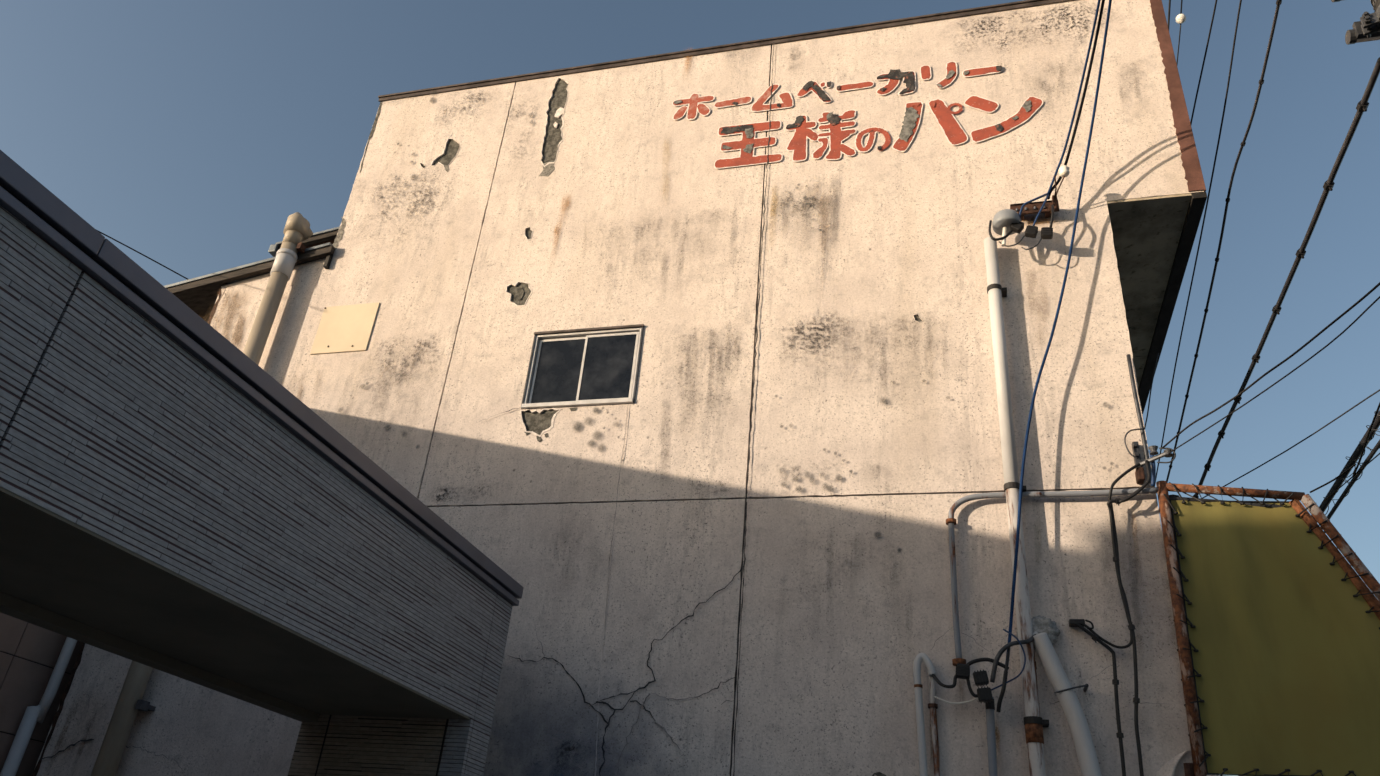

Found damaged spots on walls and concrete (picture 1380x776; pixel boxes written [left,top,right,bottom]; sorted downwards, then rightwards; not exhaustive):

spalling [539,77,568,177]
spalling [420,134,460,172]
spalling [505,281,532,306]
water stain [789,319,833,348]
spalling [520,407,577,442]
water stain [574,407,619,450]
crack [510,42,774,776]
water stain [781,449,853,491]